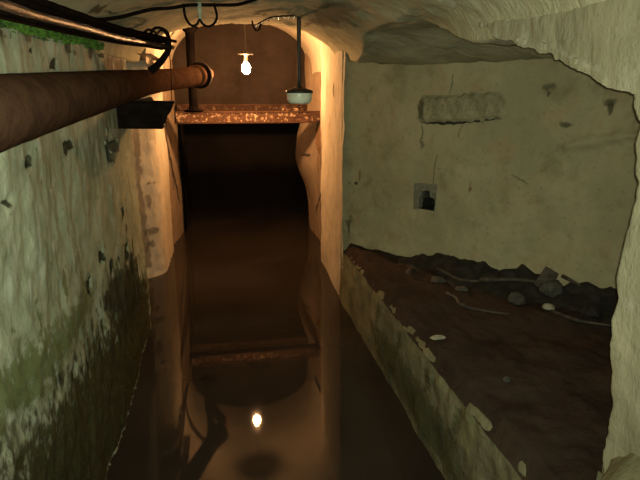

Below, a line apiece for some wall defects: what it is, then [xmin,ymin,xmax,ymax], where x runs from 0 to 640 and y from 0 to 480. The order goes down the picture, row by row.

spalling [418,92,507,125]
leakage [0,224,152,480]